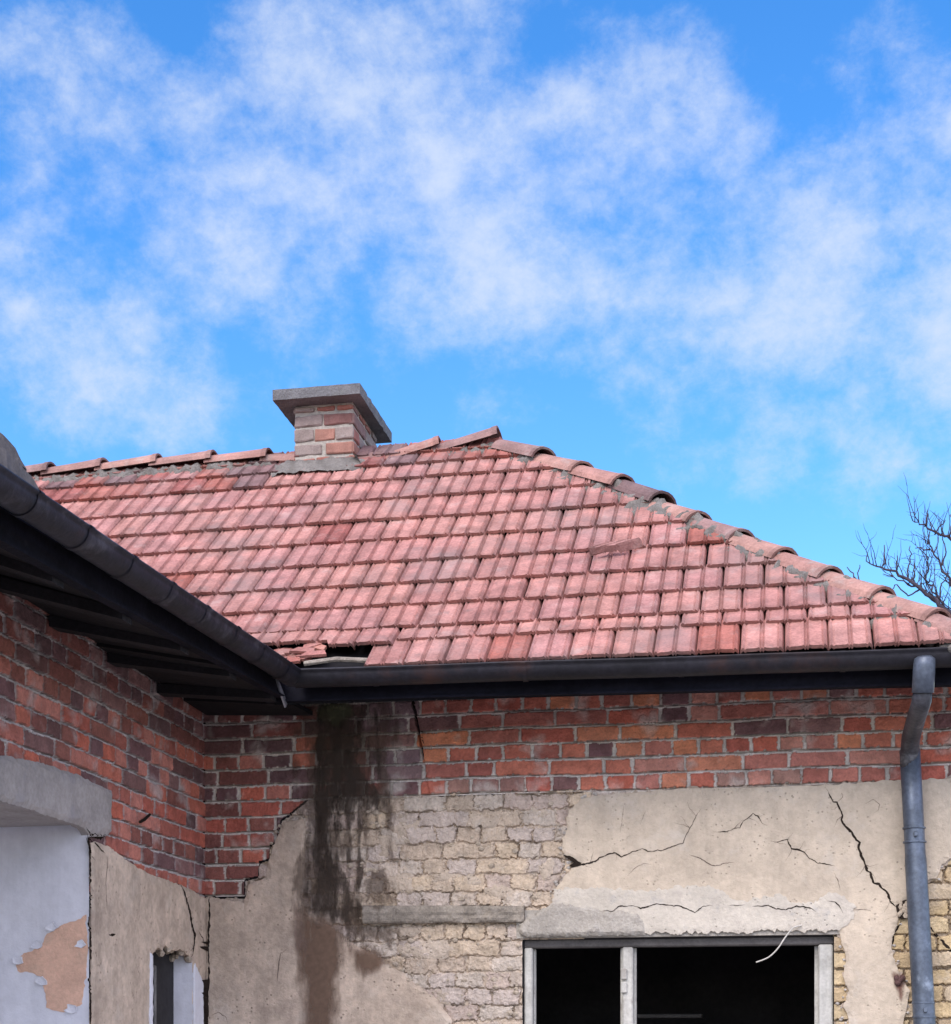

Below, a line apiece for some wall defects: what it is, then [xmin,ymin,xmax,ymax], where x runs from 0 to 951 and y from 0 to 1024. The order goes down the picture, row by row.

peeling [12,915,88,1014]
crack [178,884,227,1024]
leakage [296,702,383,1024]
spalling [225,789,598,1024]
crack [564,805,732,871]
crack [603,792,901,948]
spalling [891,900,913,1024]
spalling [928,860,951,1024]